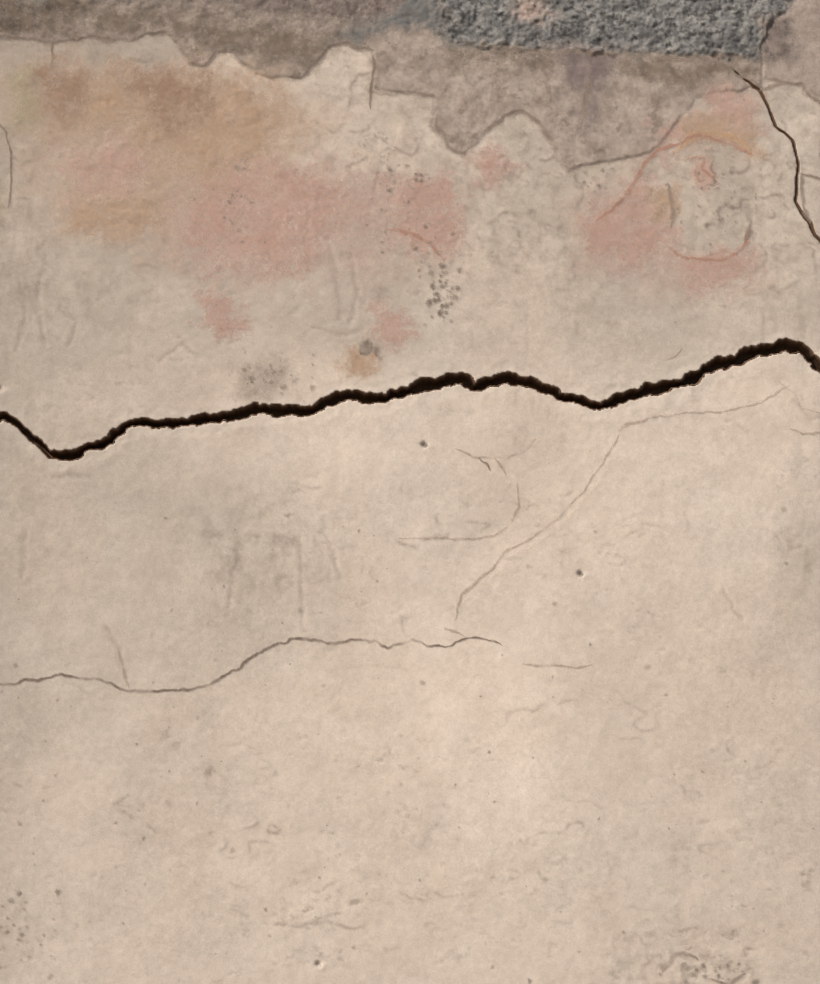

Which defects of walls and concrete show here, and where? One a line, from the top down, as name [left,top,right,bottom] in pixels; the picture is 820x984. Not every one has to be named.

peeling [0,0,820,221]
crack [732,68,820,243]
crack [0,338,820,503]
crack [457,449,519,515]
crack [8,533,537,692]